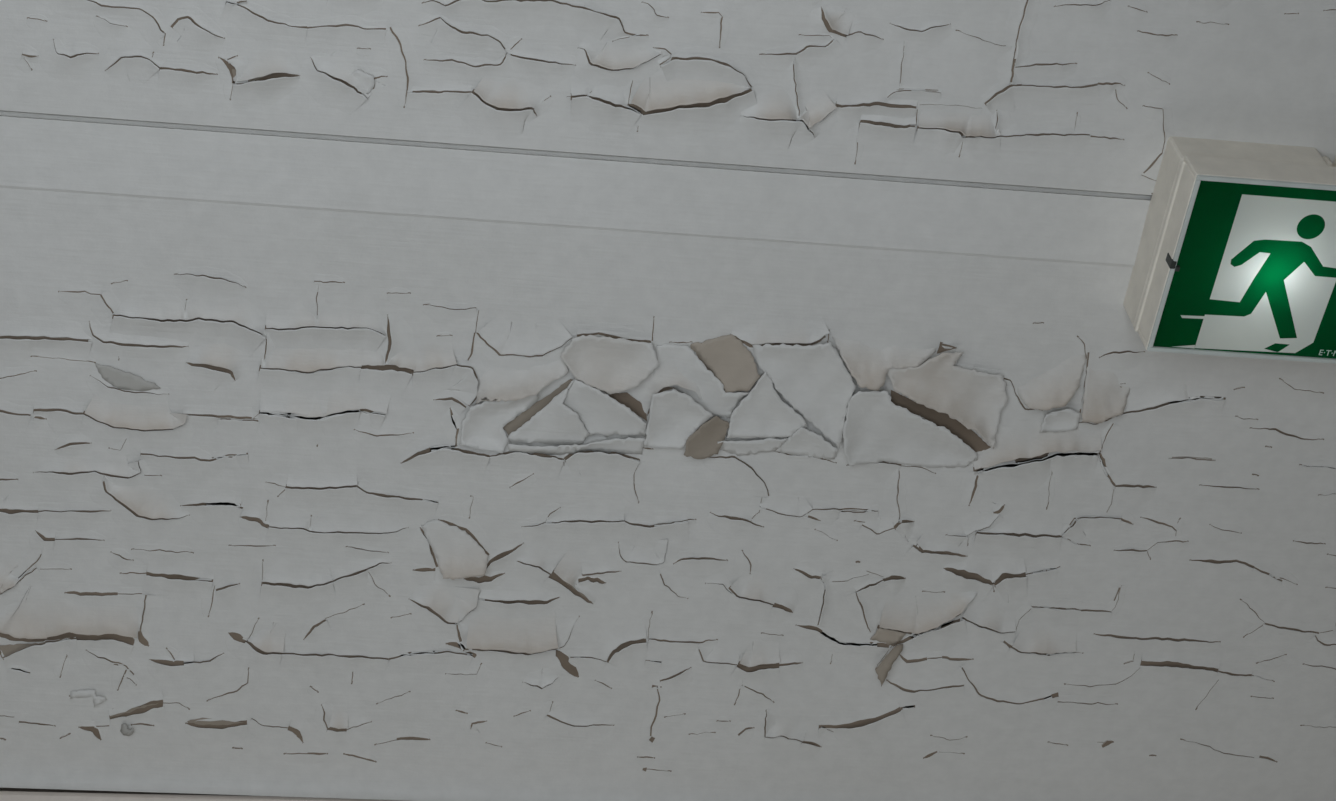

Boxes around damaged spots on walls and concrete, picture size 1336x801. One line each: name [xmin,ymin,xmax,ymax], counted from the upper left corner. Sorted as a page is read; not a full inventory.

peeling [215,46,388,116]
peeling [407,5,1092,164]
peeling [0,294,1228,745]
crack [649,376,1336,769]
peeling [754,709,823,758]